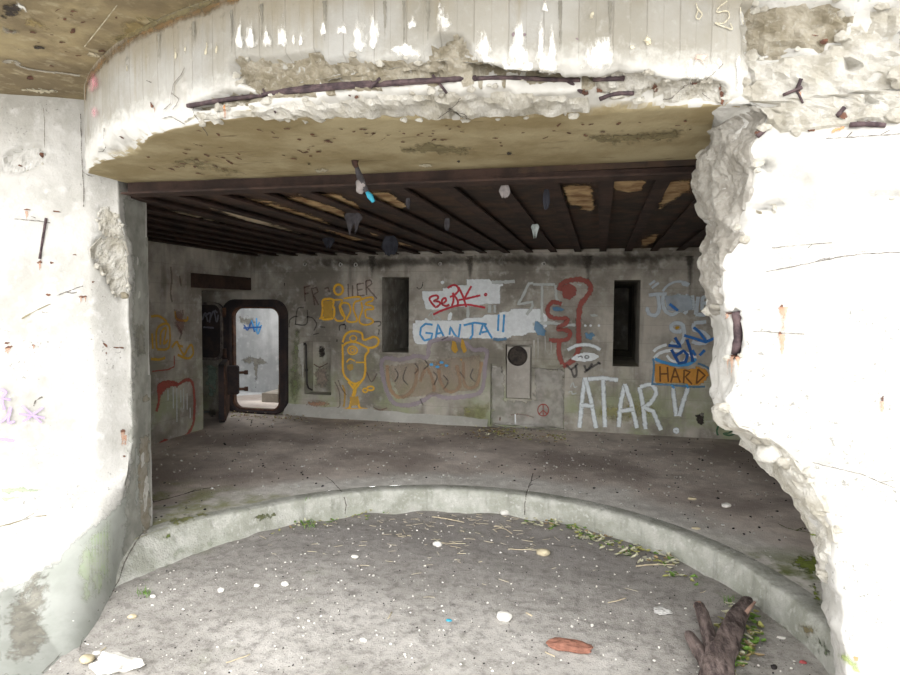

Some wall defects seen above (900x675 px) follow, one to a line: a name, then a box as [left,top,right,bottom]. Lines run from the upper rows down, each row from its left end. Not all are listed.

spalling [184,34,731,127]
spalling [659,0,900,319]
spalling [722,311,744,361]
corrosion [778,304,788,353]
leakage [6,573,48,660]